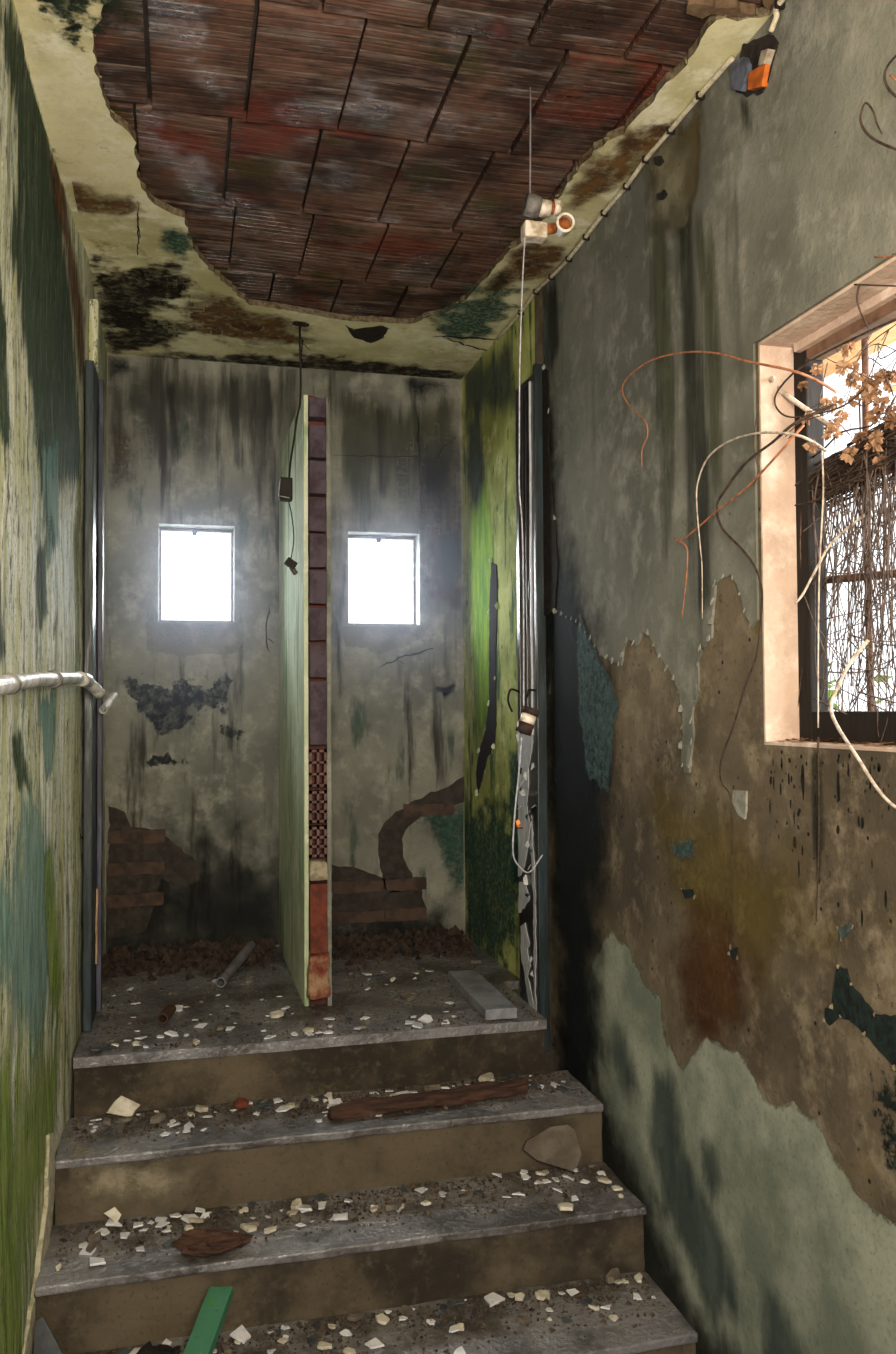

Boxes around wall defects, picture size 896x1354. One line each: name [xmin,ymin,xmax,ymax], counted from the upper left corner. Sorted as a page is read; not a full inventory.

leakage [37,0,136,51]
leakage [0,269,10,449]
leakage [49,147,483,610]
leakage [488,242,564,359]
leakage [13,726,30,792]
spalling [331,558,499,925]
peeling [732,790,748,819]
spalling [106,806,201,940]
leakage [546,549,896,1354]
spalling [822,964,896,1071]